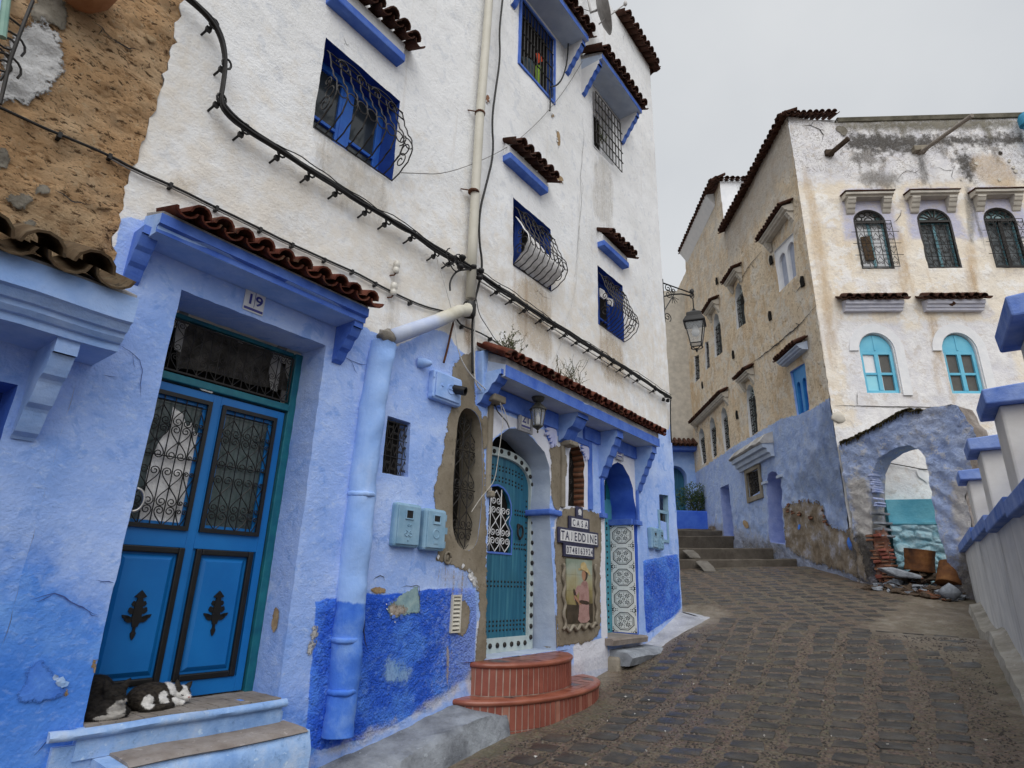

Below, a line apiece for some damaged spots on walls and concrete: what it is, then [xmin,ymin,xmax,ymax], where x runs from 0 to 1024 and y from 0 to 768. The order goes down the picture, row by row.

damp [840,119,1024,188]
flaking render [782,498,891,582]
crack [31,593,98,617]
peeling [271,608,279,633]
peeling [386,586,423,623]
peeling [17,660,69,703]